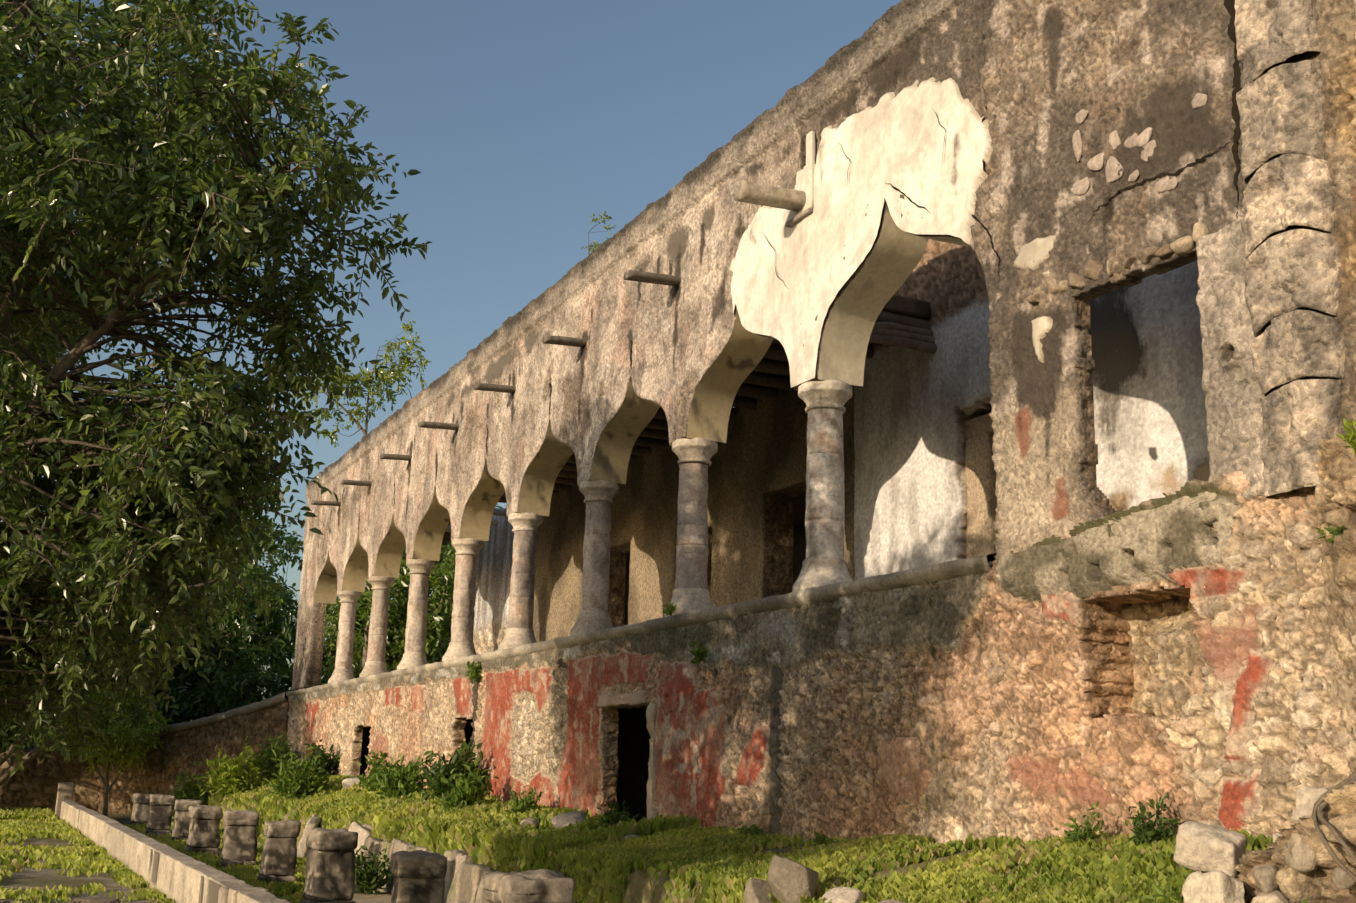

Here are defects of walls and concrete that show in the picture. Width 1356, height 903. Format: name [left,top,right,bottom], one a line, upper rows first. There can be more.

crack [886,183,931,214]
spalling [1072,109,1157,195]
crack [1087,0,1242,224]
spalling [1155,175,1178,193]
spalling [1191,93,1207,108]
peeling [453,650,770,828]